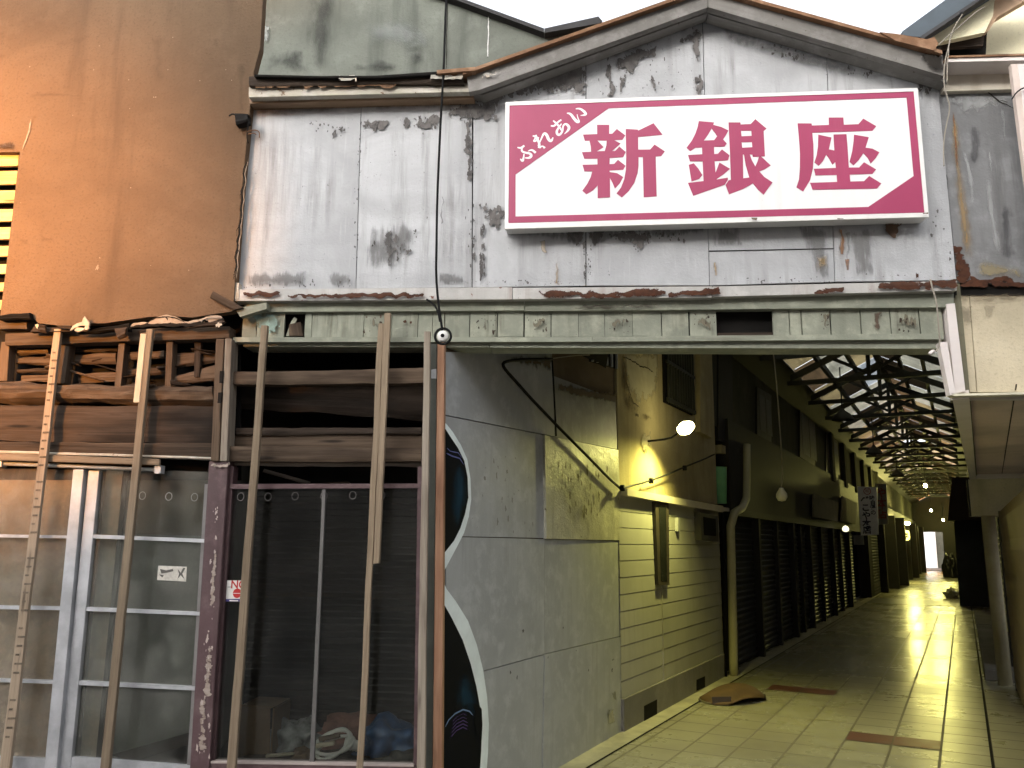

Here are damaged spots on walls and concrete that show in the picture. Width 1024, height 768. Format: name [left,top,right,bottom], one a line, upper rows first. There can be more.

peeling [403,27,703,180]
rust [243,290,424,299]
peeling [465,203,505,281]
rust [539,263,721,299]
rust [878,114,1024,290]
peeling [196,630,213,759]